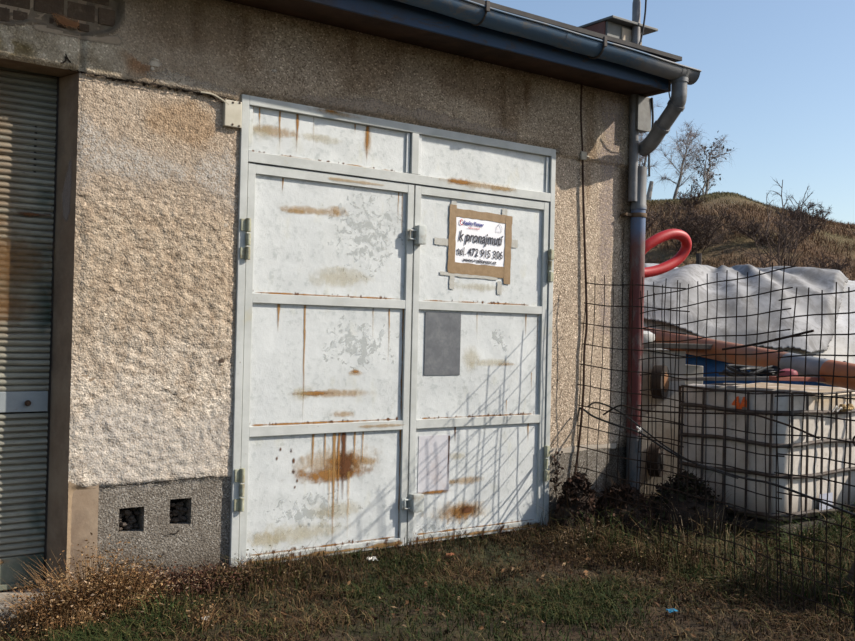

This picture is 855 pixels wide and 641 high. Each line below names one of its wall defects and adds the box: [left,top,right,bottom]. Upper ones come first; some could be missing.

flaking render [0,0,125,45]
crack [61,54,236,103]
peeling [330,193,402,279]
corrosion [258,292,392,376]
peeling [324,317,394,369]
corrosion [254,309,404,517]
corrosion [244,505,538,567]